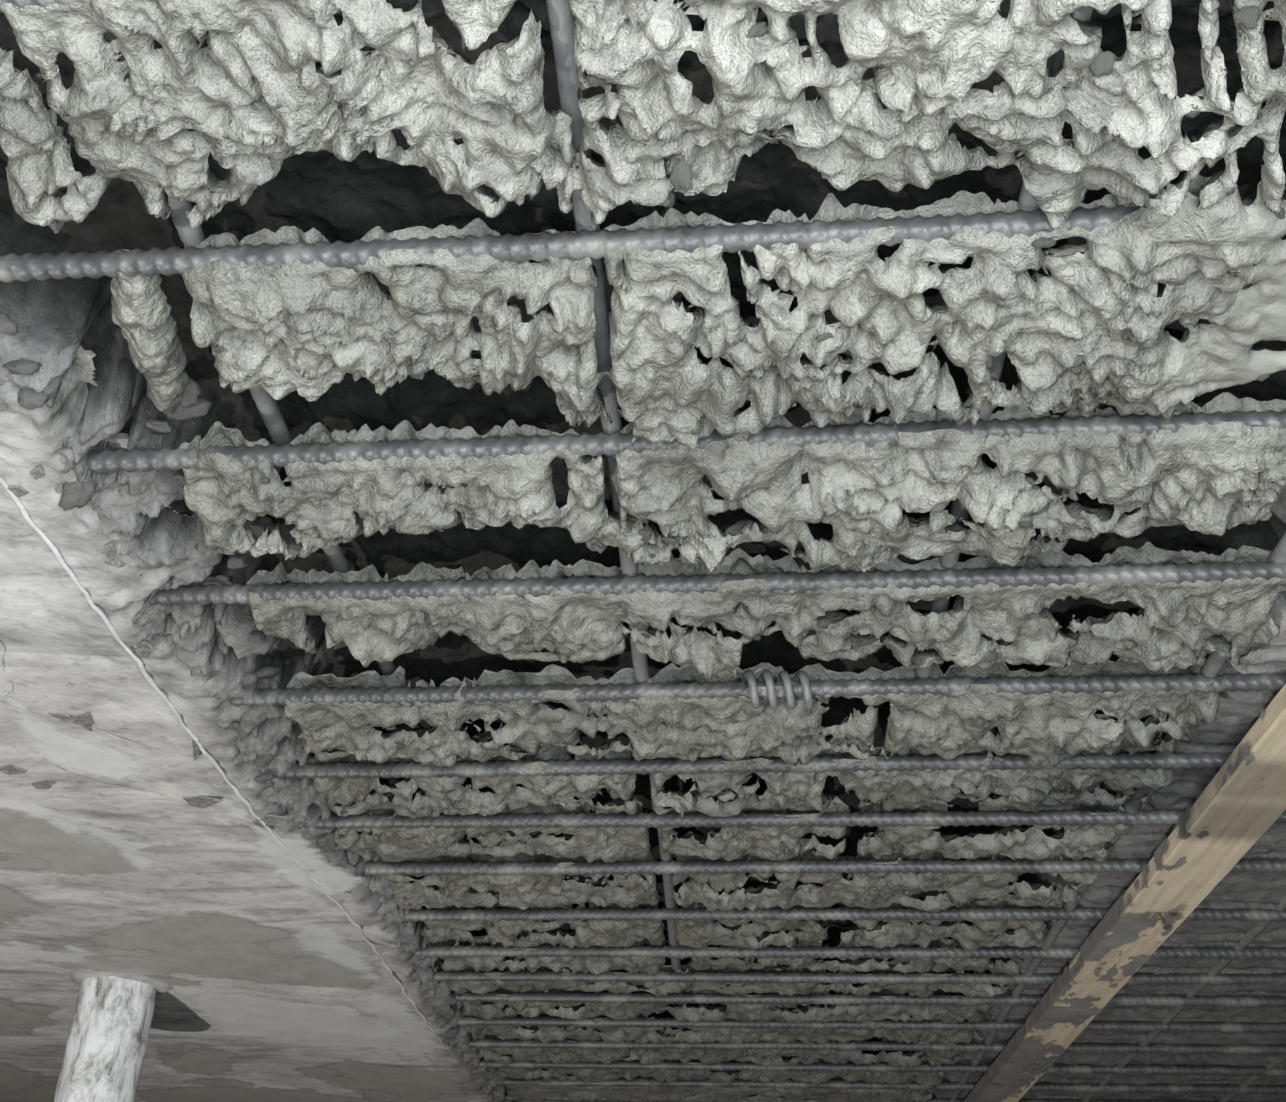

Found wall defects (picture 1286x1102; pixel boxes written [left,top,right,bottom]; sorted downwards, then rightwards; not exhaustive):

spalling [386,0,560,115]
spalling [790,13,849,67]
spalling [1168,0,1244,101]
spalling [0,146,185,256]
spalling [201,129,575,243]
spalling [599,123,1025,230]
spalling [1163,111,1286,200]
spalling [722,250,798,325]
spalling [1191,370,1286,408]
spalling [1035,487,1286,563]
spalling [0,273,681,1102]
spalling [648,617,904,675]